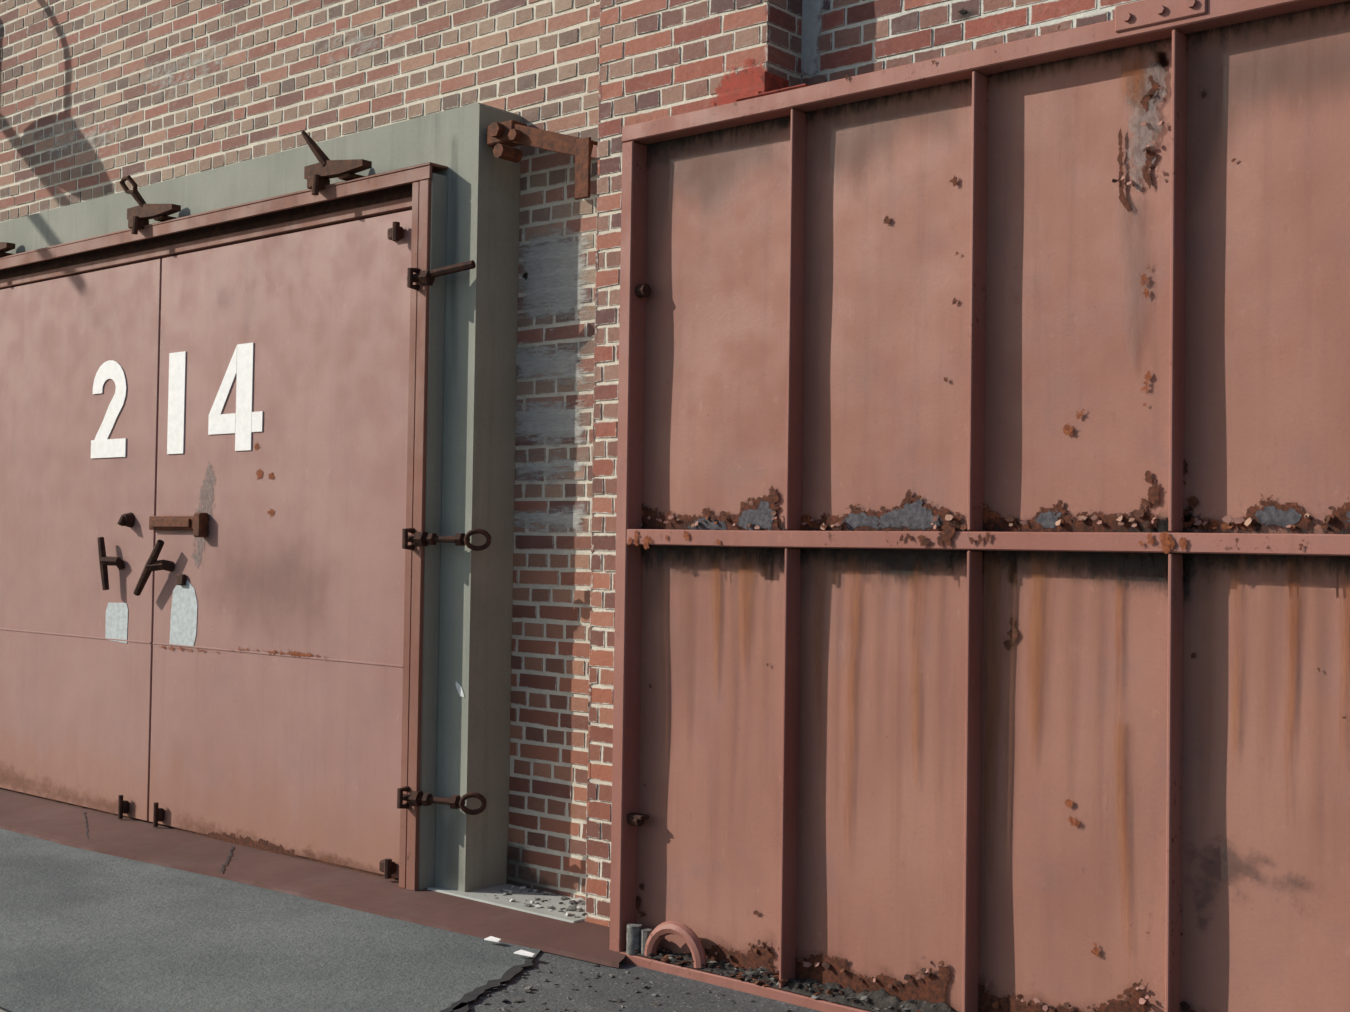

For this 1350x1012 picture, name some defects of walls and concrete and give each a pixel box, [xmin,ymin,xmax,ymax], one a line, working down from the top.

rust [1139,470,1161,510]
rust [900,520,991,548]